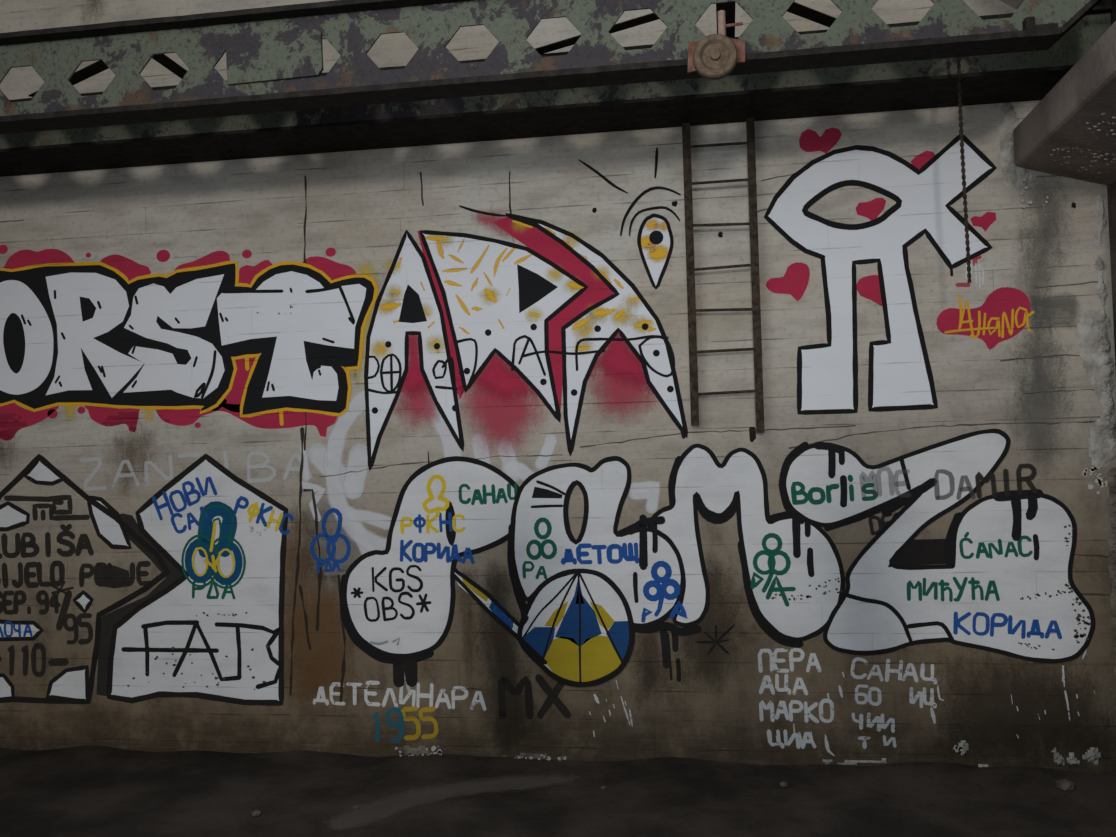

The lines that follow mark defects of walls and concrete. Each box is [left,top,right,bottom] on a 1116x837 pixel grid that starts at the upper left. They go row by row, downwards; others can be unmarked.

spalling [998,102,1049,208]